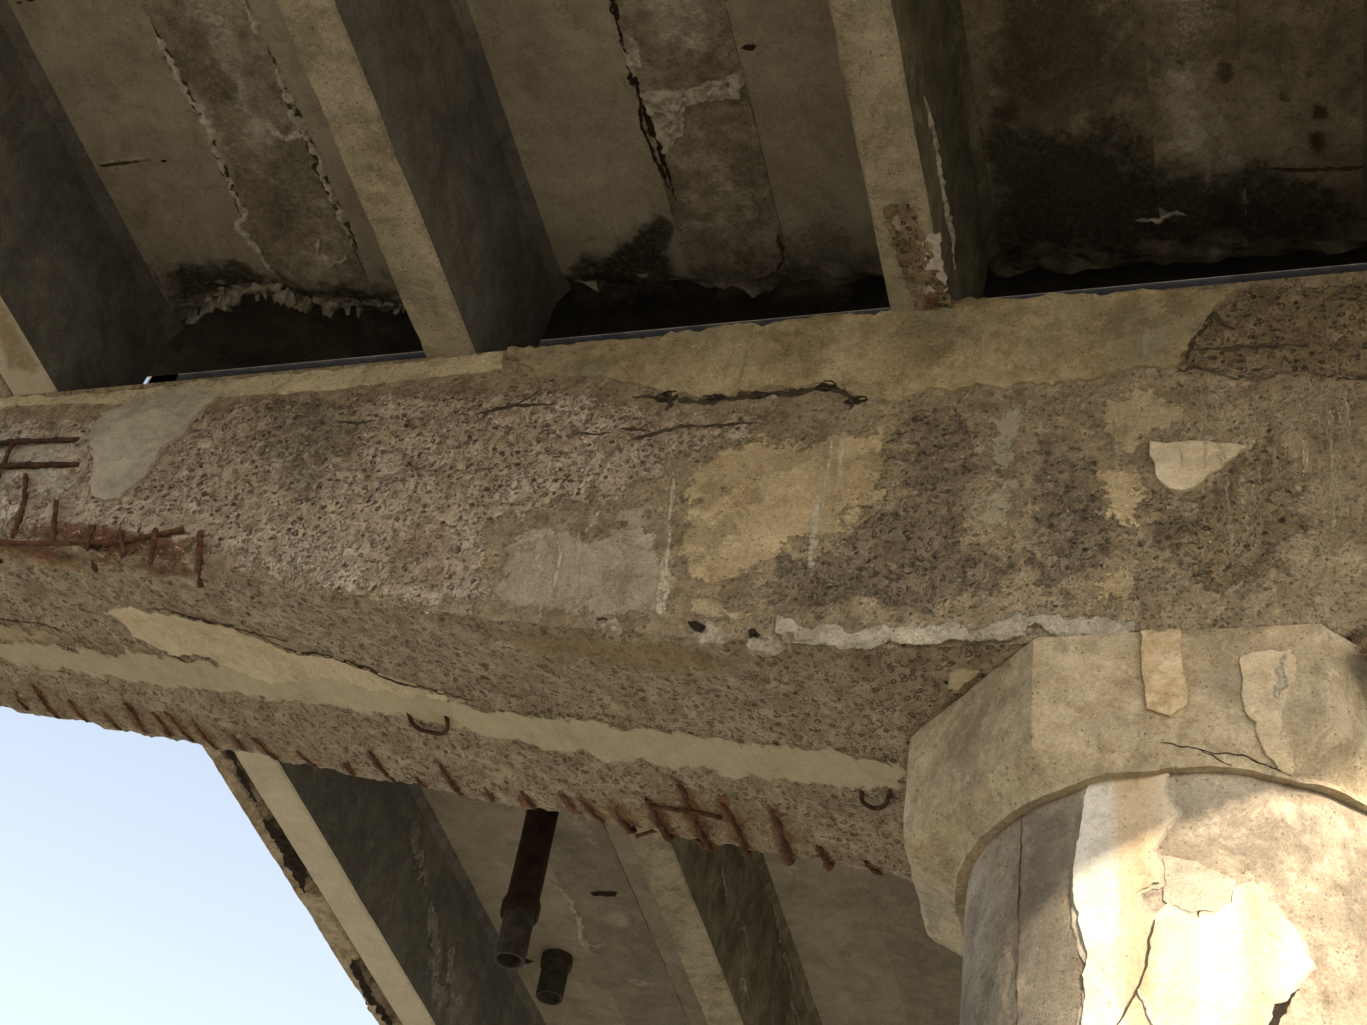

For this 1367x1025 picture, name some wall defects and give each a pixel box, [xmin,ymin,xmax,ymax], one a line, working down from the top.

crack [609,0,676,201]
damp [982,0,1365,264]
damp [566,215,681,311]
spalling [1177,282,1367,382]
spalling [0,378,765,614]
corrosion [0,522,195,577]
peeling [103,605,465,702]
corrosion [102,699,214,745]
crack [1014,815,1022,1025]
peeling [1073,772,1312,1025]
crack [1268,989,1300,1025]